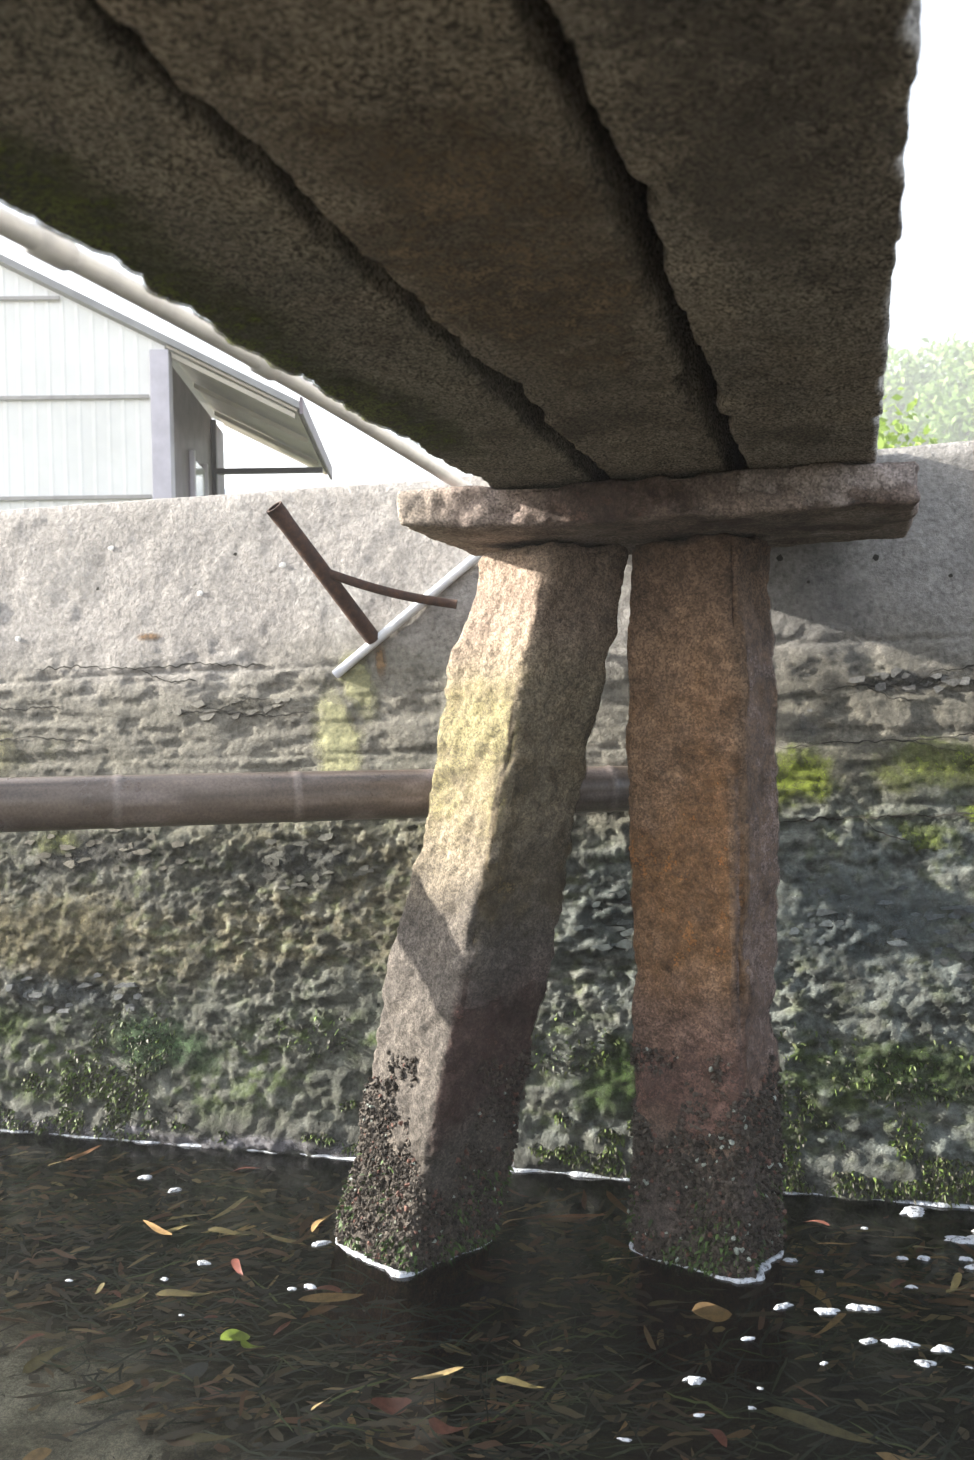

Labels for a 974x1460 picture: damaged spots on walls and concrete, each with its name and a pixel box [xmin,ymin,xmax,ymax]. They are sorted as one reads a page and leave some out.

crack [820,664,974,701]
crack [779,732,974,751]